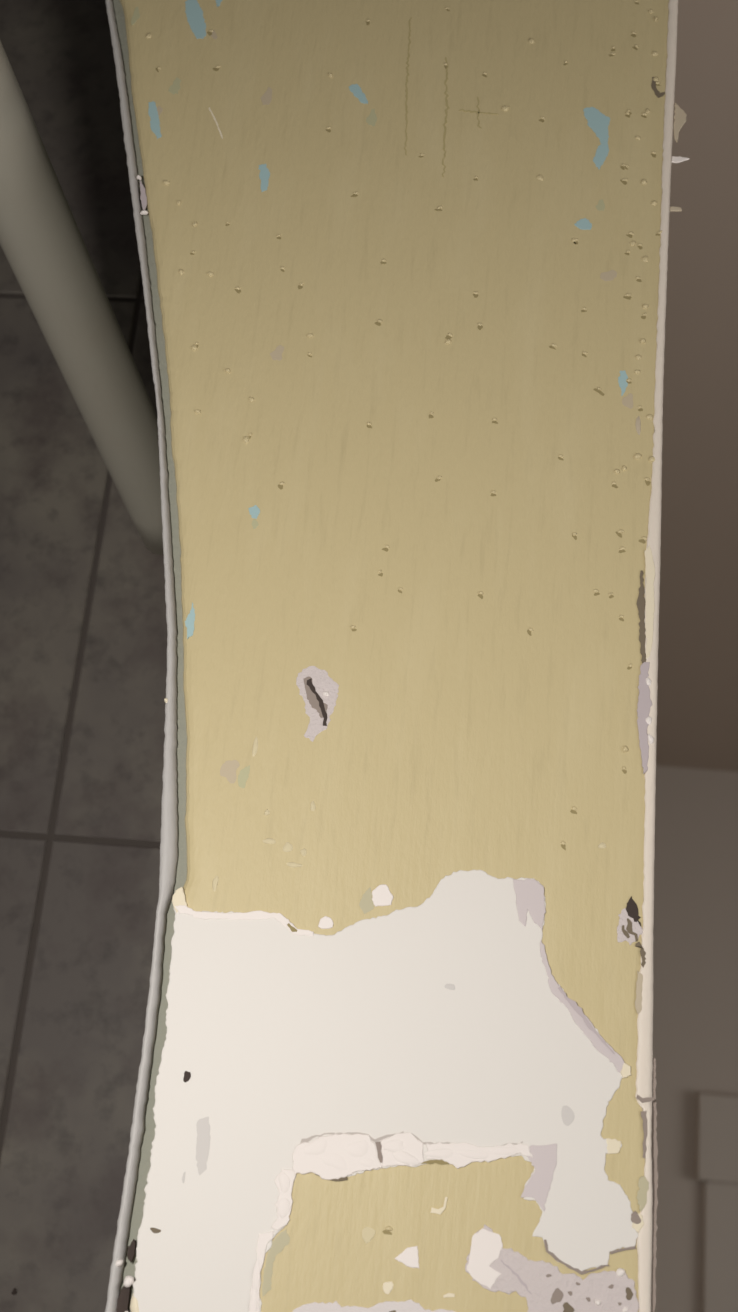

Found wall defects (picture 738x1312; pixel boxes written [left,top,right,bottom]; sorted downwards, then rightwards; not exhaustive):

flaking render [296,666,339,742]
peeling [133,870,643,1312]